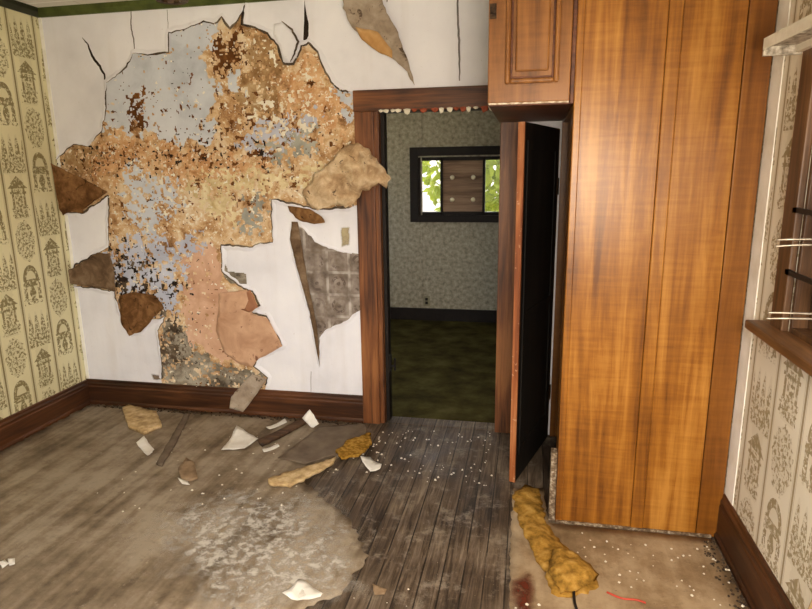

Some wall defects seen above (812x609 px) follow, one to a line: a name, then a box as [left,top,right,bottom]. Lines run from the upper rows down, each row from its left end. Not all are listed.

crack [83,39,106,80]
peeling [343,0,414,83]
crack [454,0,462,81]
peeling [51,3,391,389]